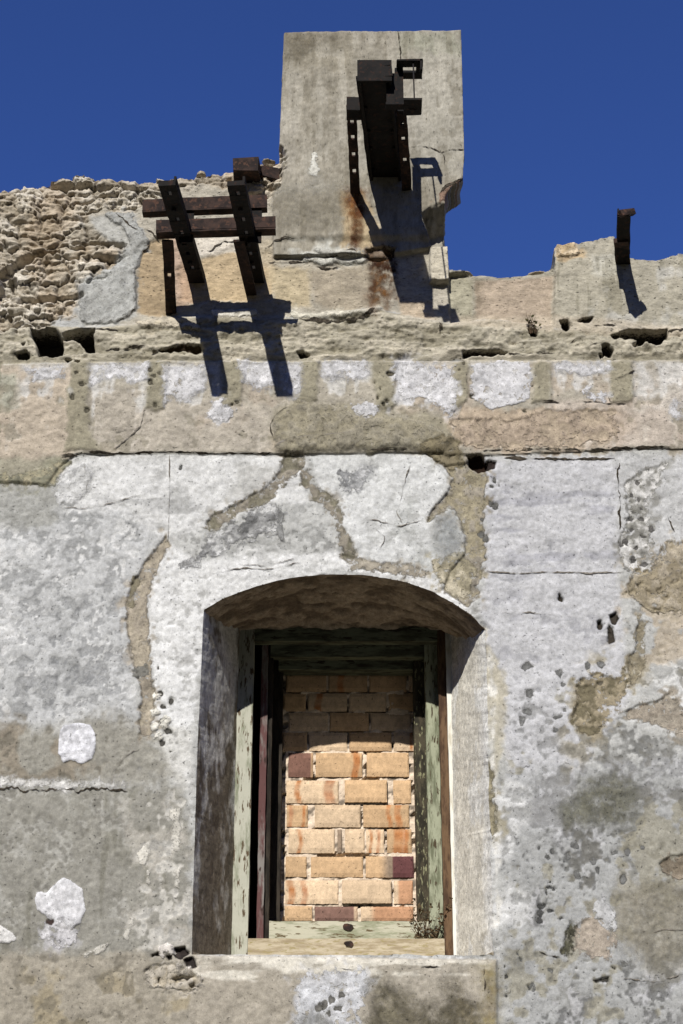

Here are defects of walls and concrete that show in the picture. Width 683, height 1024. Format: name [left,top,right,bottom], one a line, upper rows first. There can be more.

spalling [439,178,463,203]
rust [345,191,363,243]
flaking render [77,211,200,331]
rust [364,253,396,301]
crack [63,413,272,535]
crack [369,447,420,546]
flaking render [179,333,668,607]
crack [489,568,618,576]
flaking render [553,461,683,735]
flaking render [519,689,533,726]
crack [0,748,140,793]
flaking render [144,942,203,994]